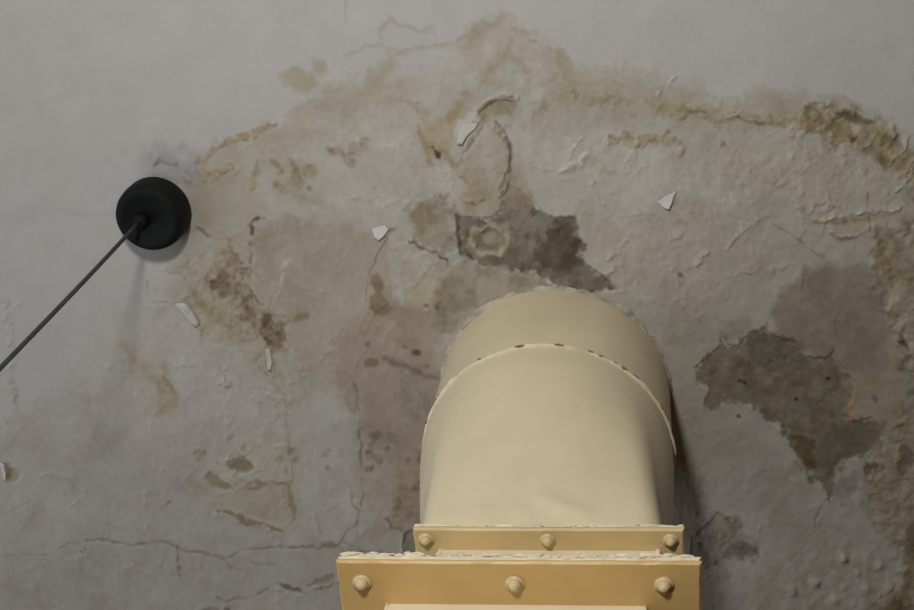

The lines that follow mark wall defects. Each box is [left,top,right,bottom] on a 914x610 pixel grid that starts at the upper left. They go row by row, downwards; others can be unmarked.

leakage [0,52,470,610]
crack [337,316,394,556]
peeling [365,431,422,554]
spalling [403,193,618,336]
leakage [395,10,914,610]
spalling [695,321,887,508]
peeling [807,193,904,243]